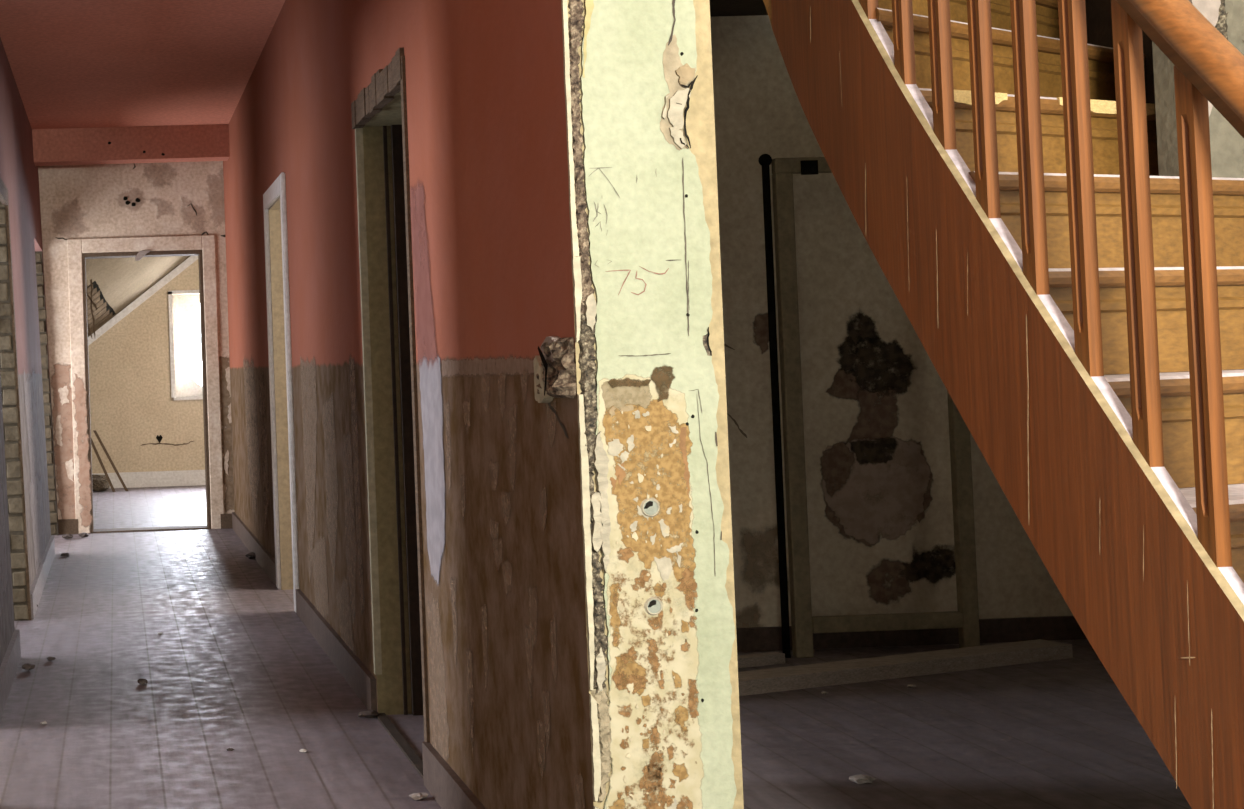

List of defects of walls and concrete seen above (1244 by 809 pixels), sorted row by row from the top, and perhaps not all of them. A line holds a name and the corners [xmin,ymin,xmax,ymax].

spalling [1189,0,1233,43]
peeling [35,251,93,535]
peeling [410,0,737,809]